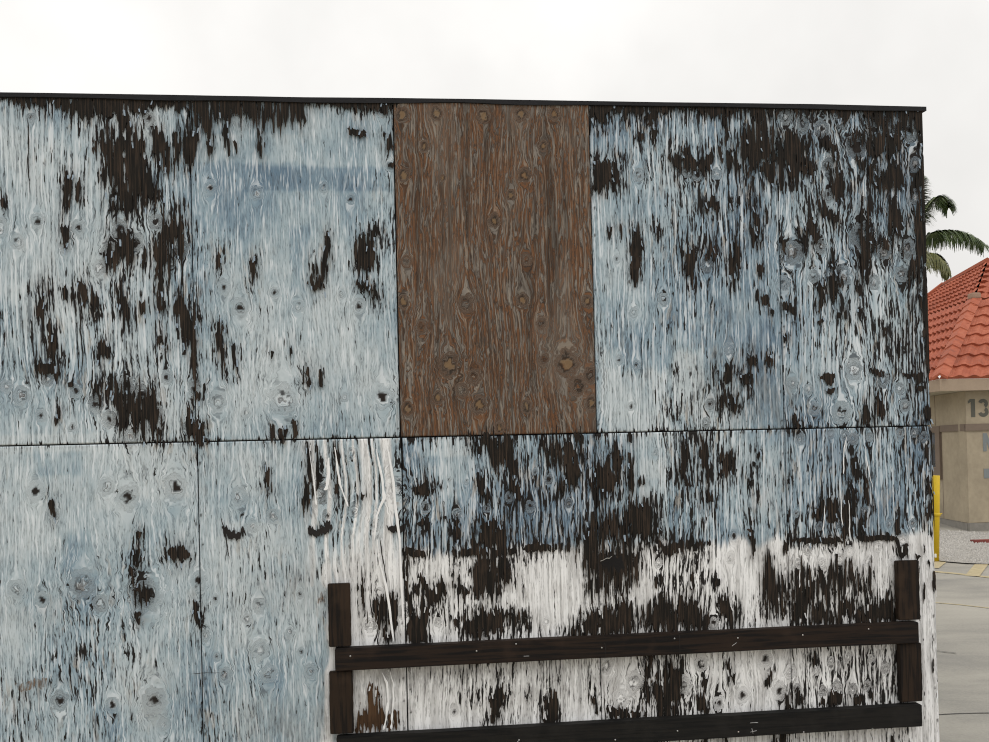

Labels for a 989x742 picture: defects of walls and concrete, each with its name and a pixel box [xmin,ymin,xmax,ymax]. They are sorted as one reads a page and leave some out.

peeling [0,97,398,452]
peeling [588,106,930,383]
peeling [719,351,775,414]
peeling [129,531,150,625]
peeling [164,541,190,568]
peeling [357,425,740,645]
peeling [747,451,937,626]
peeling [355,681,399,733]
peeling [488,682,505,726]
peeling [589,655,683,720]
peeling [696,676,716,714]
peeling [819,687,874,707]